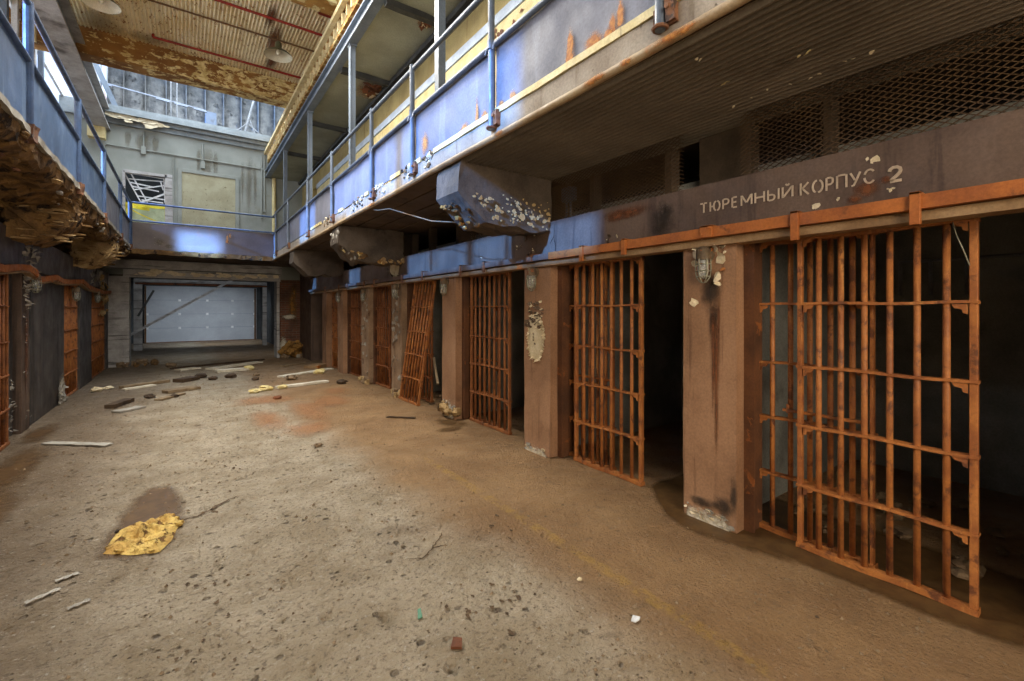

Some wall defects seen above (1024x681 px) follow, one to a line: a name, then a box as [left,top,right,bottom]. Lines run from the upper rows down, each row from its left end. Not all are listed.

corrosion [566,0,623,62]
spalling [0,129,130,258]
spalling [352,183,385,212]
peeling [440,193,551,230]
peeling [324,215,404,342]
peeling [524,301,546,363]
corrosion [712,307,720,443]
leakage [100,487,183,558]
leakage [652,474,1024,646]